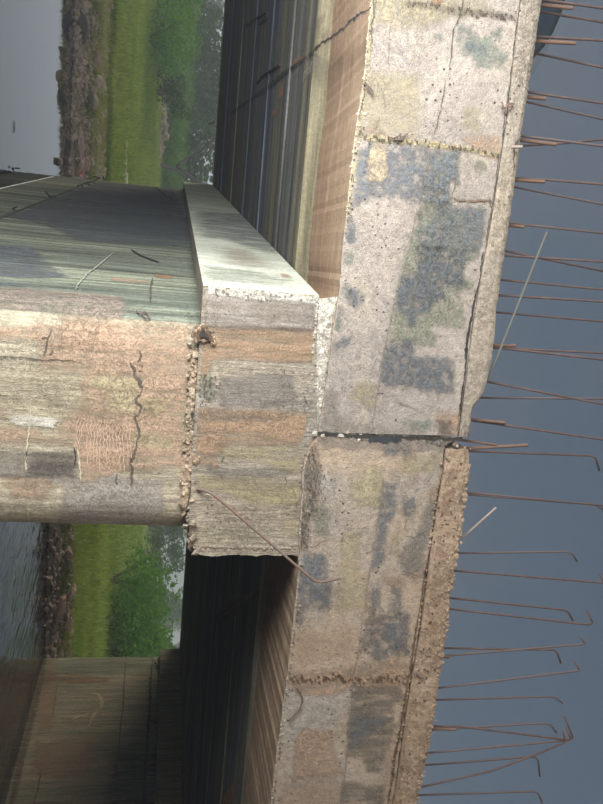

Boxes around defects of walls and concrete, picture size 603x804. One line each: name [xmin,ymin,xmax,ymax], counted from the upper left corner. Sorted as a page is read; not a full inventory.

crack [424,0,463,184]
water stain [0,244,188,525]
water stain [9,182,190,247]
crack [115,350,145,484]
spalling [198,364,221,406]
crack [371,205,421,430]
water stain [353,144,484,394]
water stain [348,687,403,772]